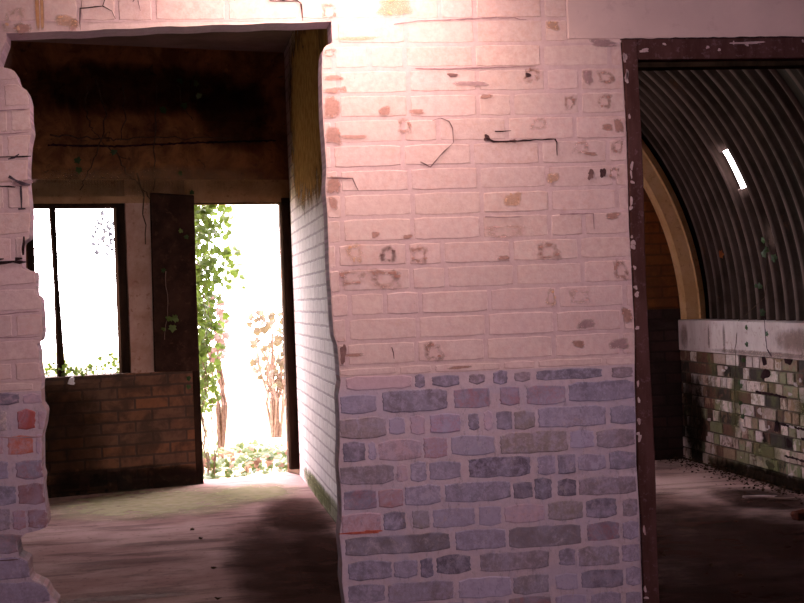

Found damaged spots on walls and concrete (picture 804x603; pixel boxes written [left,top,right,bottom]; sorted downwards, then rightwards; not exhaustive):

crack [79,0,115,24]
crack [269,0,303,20]
crack [620,34,804,42]
crack [48,140,225,148]
crack [421,118,454,167]
crack [486,130,557,151]
crack [0,154,31,210]
crack [0,236,26,265]
peeling [370,246,401,288]